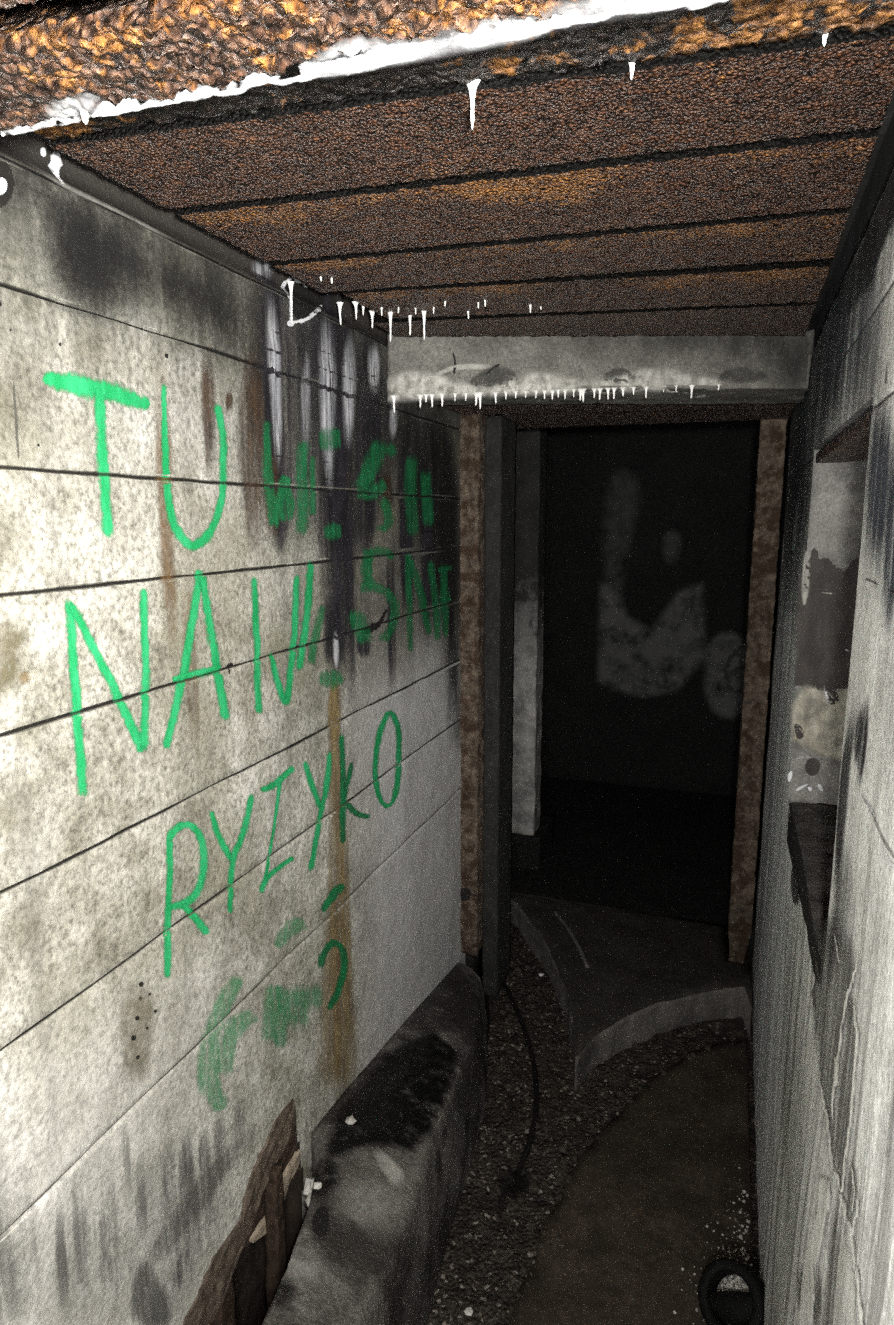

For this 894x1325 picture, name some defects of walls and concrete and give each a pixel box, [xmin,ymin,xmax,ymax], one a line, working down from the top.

water stain [0,0,714,134]
water stain [259,273,717,705]
water stain [869,426,894,605]
corrosion [326,683,353,1076]
crack [862,795,894,858]
crack [819,935,863,1325]